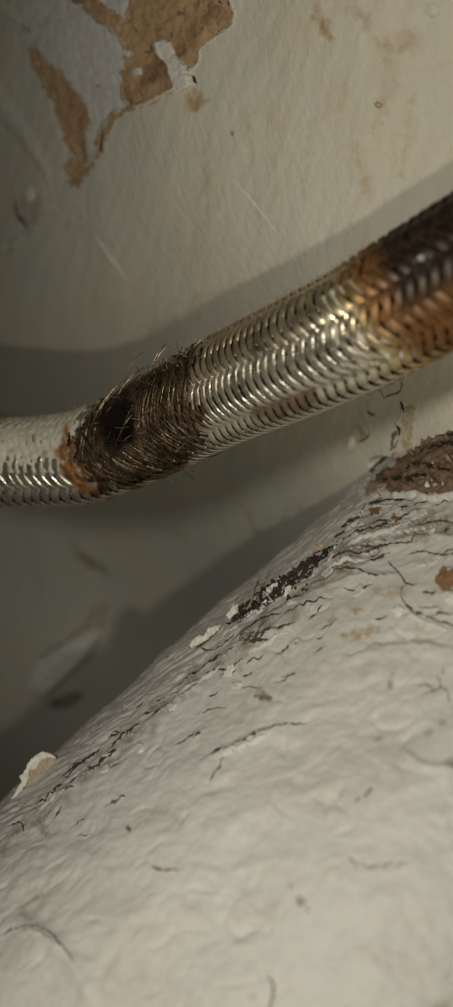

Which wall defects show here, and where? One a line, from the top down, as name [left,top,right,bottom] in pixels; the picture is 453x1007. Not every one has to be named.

peeling [15,0,237,188]
crack [9,432,453,837]
peeling [435,566,453,592]
flaking render [11,751,56,799]